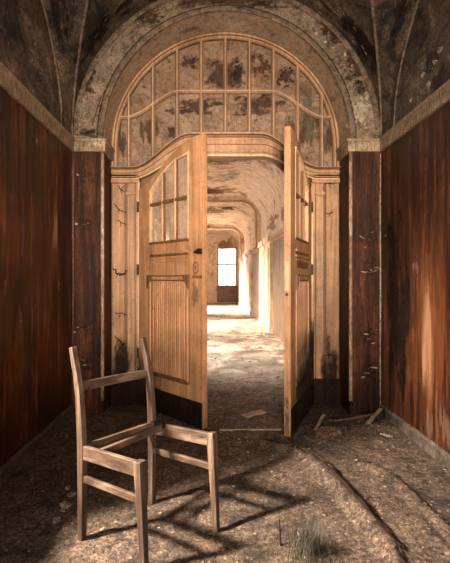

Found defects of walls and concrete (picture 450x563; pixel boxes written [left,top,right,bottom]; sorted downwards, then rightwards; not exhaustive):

damp [113,342,129,375]
damp [321,337,338,379]
crack [266,439,405,558]
crack [355,458,431,507]